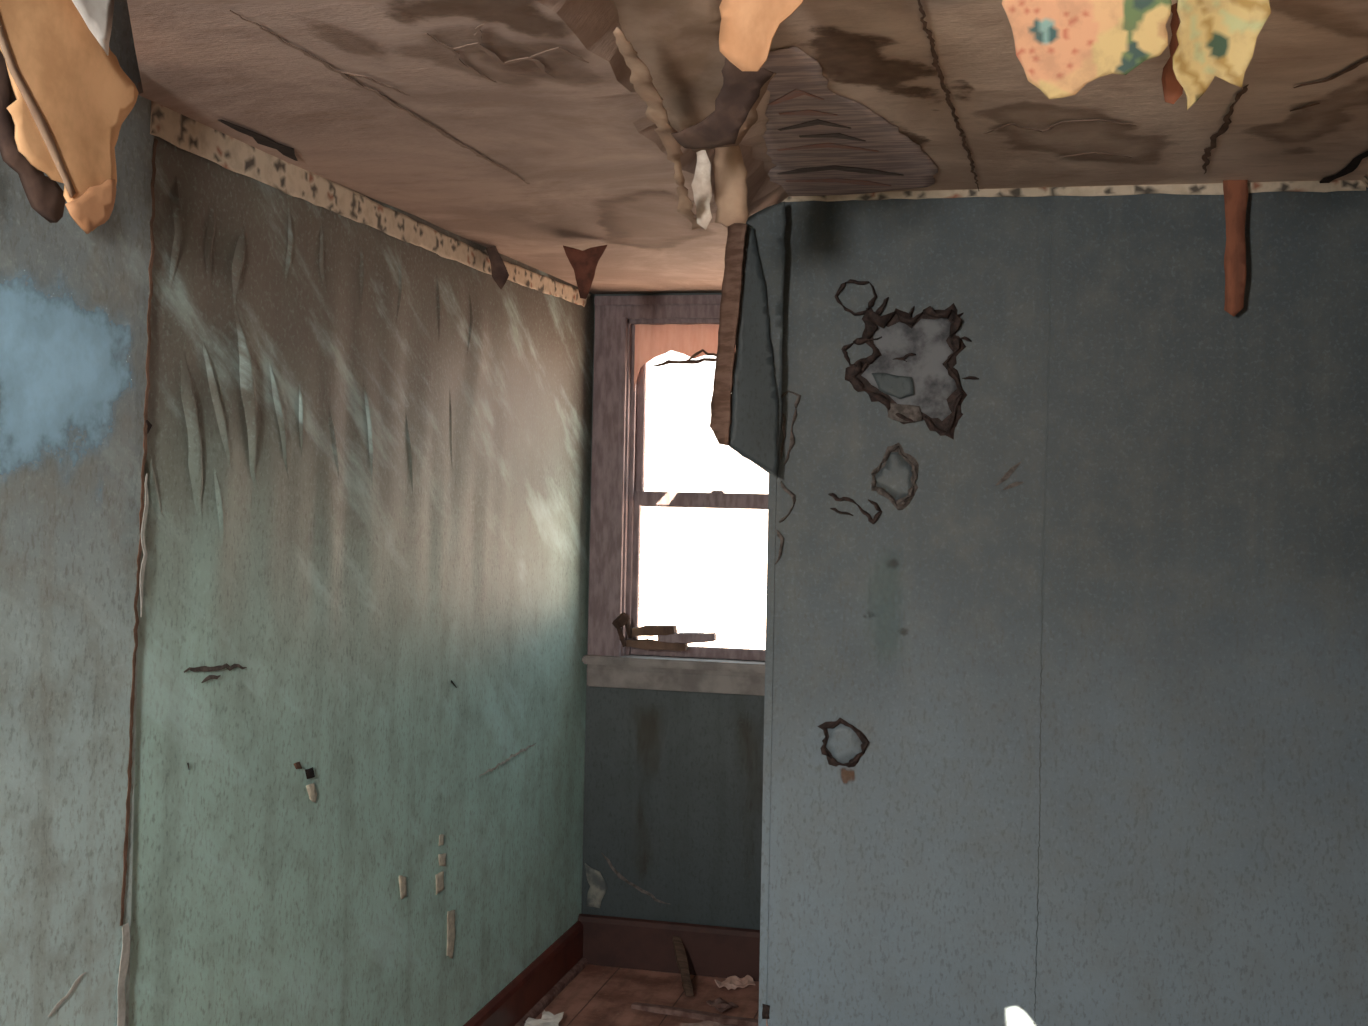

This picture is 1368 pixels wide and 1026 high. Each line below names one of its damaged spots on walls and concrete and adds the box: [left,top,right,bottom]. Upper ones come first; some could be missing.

crack [218,10,530,184]
leakage [810,28,936,98]
leakage [902,132,928,148]
crack [917,0,979,191]
crack [1202,84,1249,174]
crack [1290,58,1368,111]
crack [1320,151,1368,183]
peeling [0,279,131,473]
flaking render [835,279,979,440]
peeling [828,443,919,524]
flaking render [817,718,869,783]